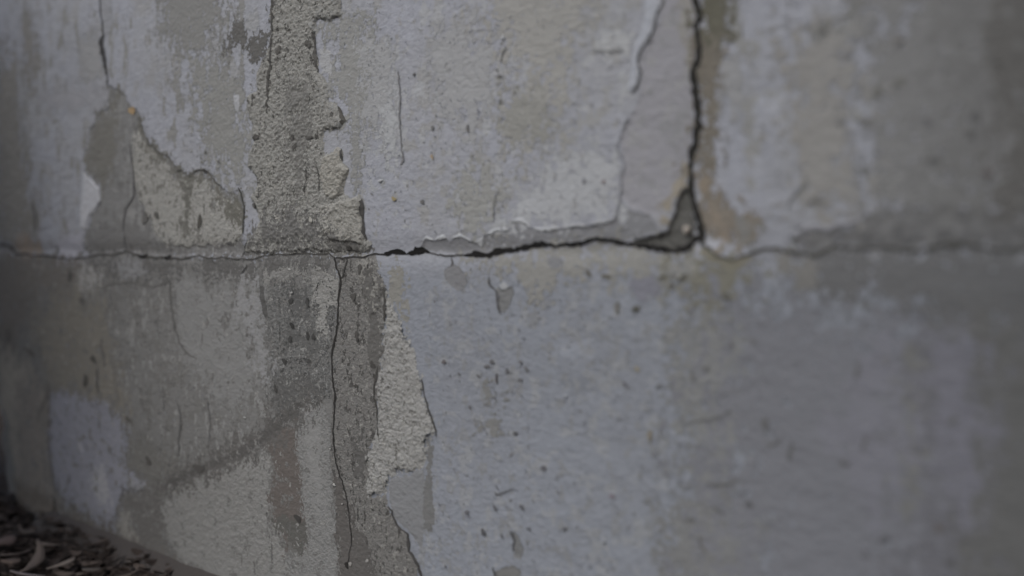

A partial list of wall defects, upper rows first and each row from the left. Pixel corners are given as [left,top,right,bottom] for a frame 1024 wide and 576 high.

crack [98,0,108,86]
crack [0,142,139,261]
peeling [80,172,100,229]
crack [100,280,197,359]
spalling [131,0,439,498]
crack [139,0,948,563]
crack [388,506,422,576]